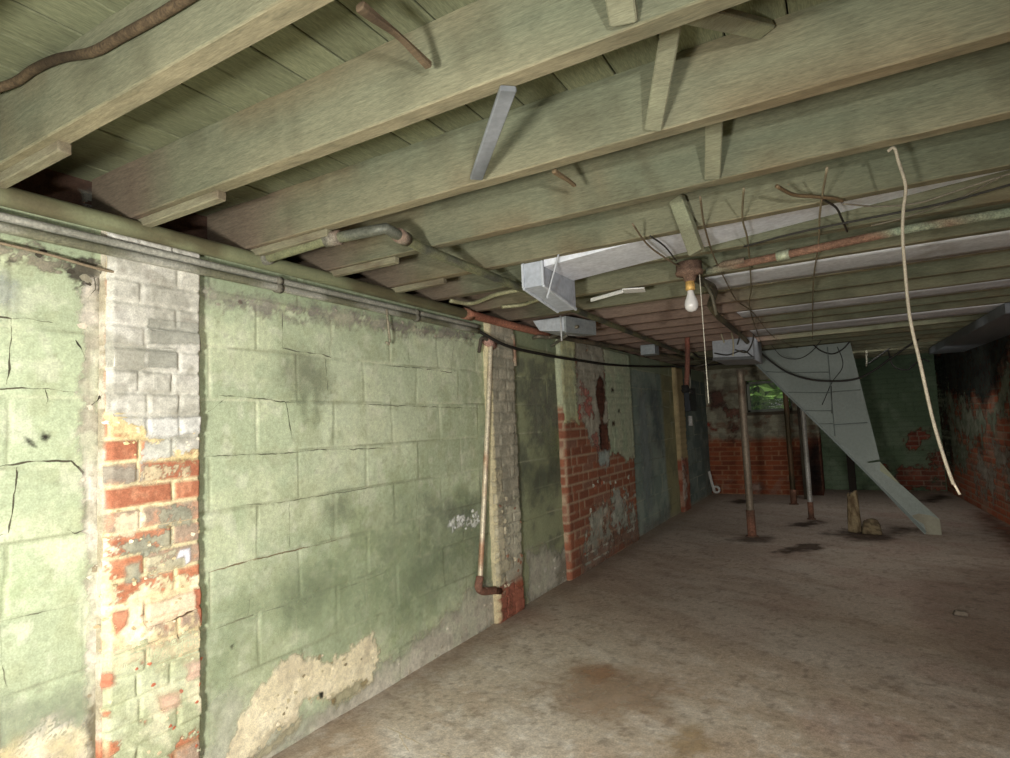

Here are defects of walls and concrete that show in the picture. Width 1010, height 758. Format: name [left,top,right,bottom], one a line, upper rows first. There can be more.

crack [0,316,67,404]
peeling [560,340,635,467]
peeling [883,361,1010,507]
crack [1,460,84,535]
peeling [0,232,567,758]
peeling [581,475,640,573]
crack [0,603,79,684]